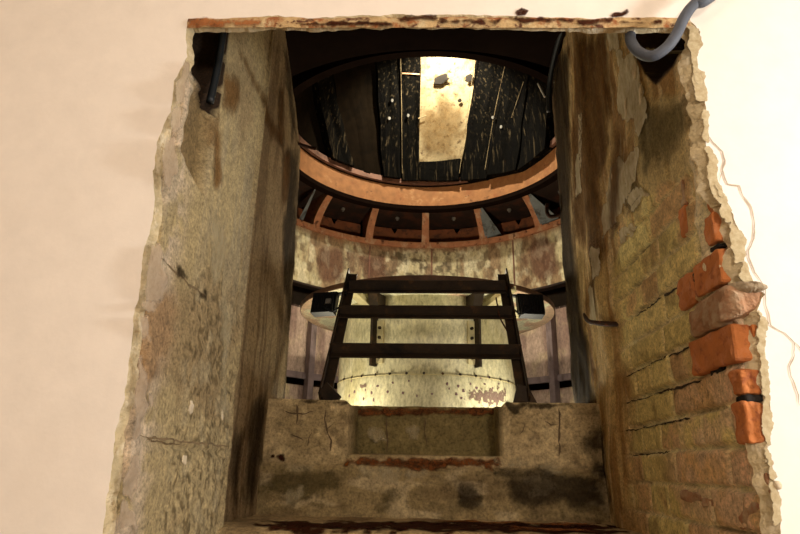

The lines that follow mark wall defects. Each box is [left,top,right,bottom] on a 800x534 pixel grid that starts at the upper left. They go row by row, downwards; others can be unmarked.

rust [299,14,501,26]
peeling [606,33,647,136]
damp [214,126,222,187]
spalling [667,24,753,311]
crack [709,137,800,406]
crack [140,435,227,447]
rust [344,457,501,471]
rust [348,376,506,416]
damp [458,484,482,509]
damp [503,432,610,508]
crack [627,380,701,404]
spalling [689,311,782,525]